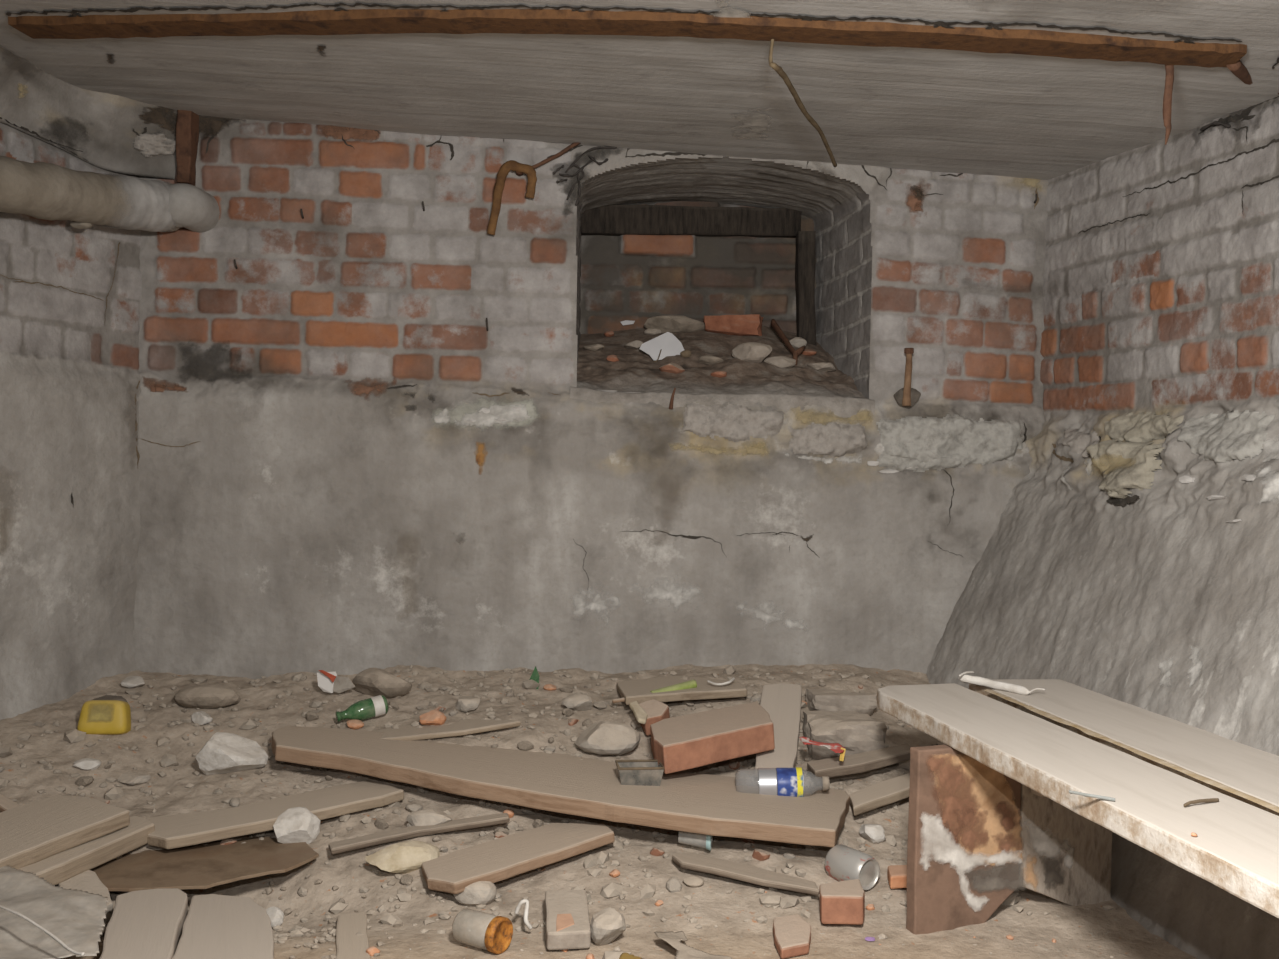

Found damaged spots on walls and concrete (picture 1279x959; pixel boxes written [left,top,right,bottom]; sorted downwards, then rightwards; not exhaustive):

crack [1078,57,1279,234]
spalling [474,388,528,397]
flaking render [680,401,1027,473]
flaking render [1052,409,1279,503]
crack [622,529,782,553]